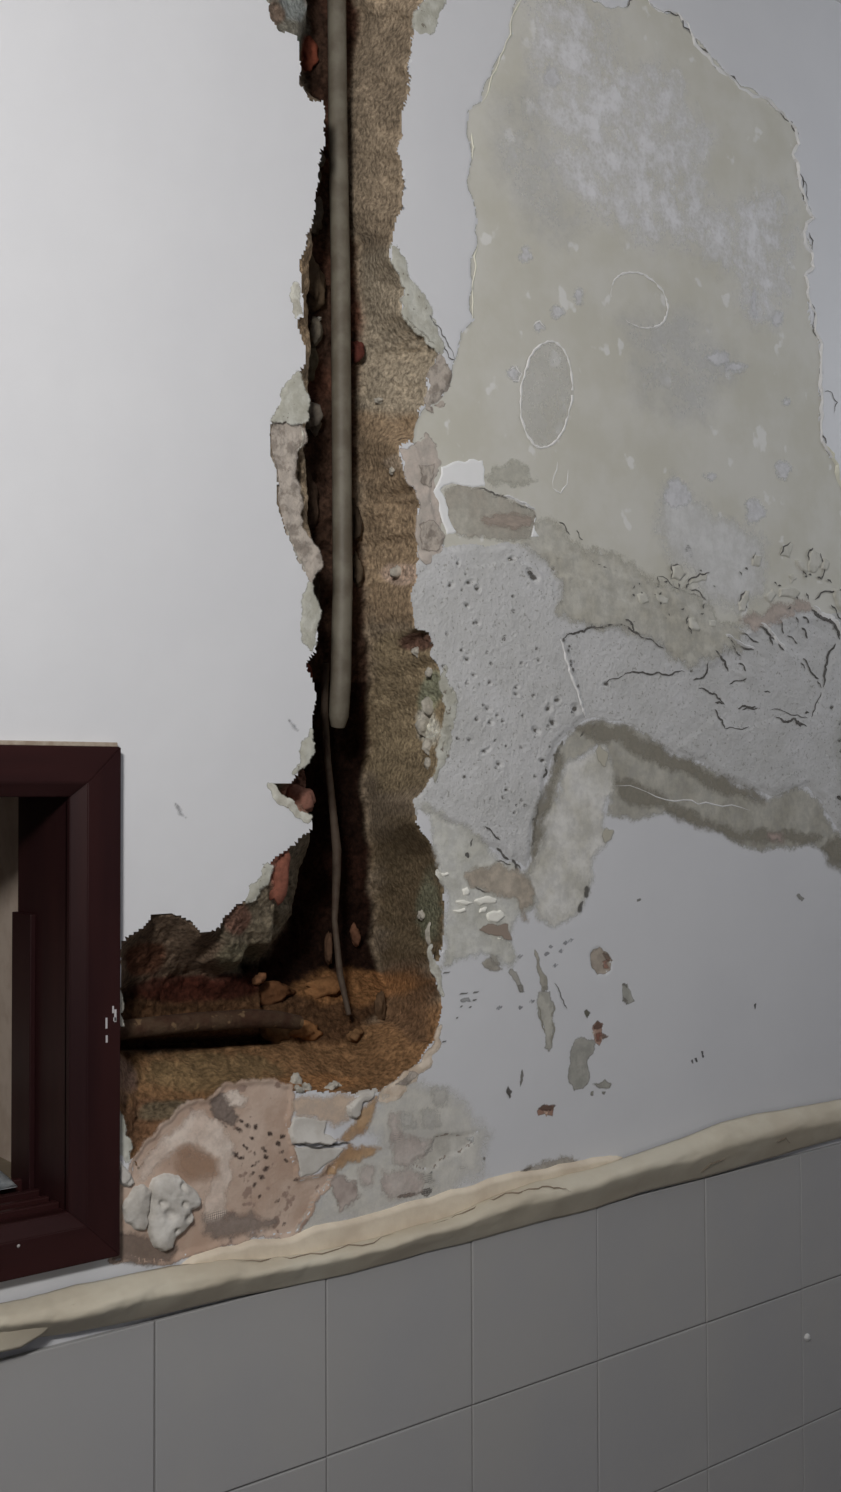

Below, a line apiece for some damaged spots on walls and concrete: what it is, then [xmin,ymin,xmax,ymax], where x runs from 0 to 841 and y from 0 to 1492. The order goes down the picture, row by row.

peeling [108,0,841,1266]
crack [479,488,616,571]
crack [657,576,706,600]
crack [563,605,841,730]
water stain [298,1084,484,1232]